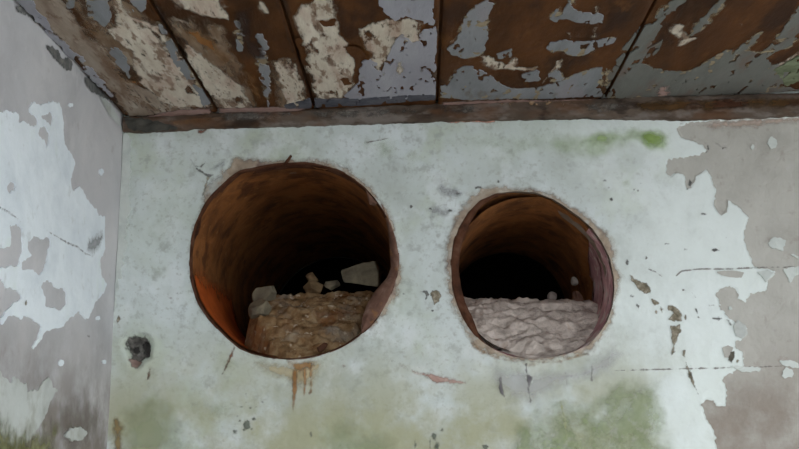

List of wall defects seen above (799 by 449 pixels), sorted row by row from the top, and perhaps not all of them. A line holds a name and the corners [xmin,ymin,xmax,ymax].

peeling [16,0,256,129]
peeling [255,0,799,109]
peeling [0,101,107,349]
peeling [666,117,799,449]
crack [676,266,792,276]
peeling [0,371,58,445]
peeling [63,427,87,442]
spalling [126,336,151,368]
corrosion [270,362,318,405]
spalling [631,276,694,385]
crack [621,365,725,373]